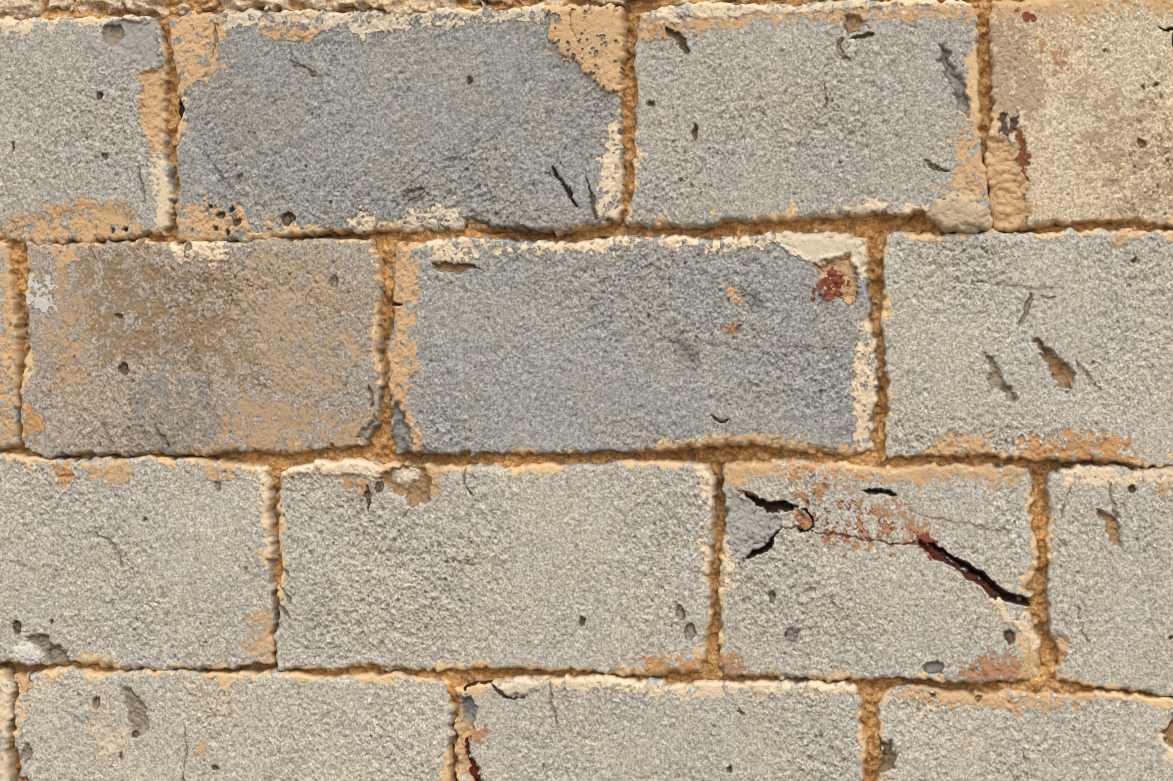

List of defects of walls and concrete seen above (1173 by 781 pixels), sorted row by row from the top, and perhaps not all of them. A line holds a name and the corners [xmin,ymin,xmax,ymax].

corrosion [997,112,1032,180]
corrosion [809,266,850,301]
crack [745,489,1030,606]